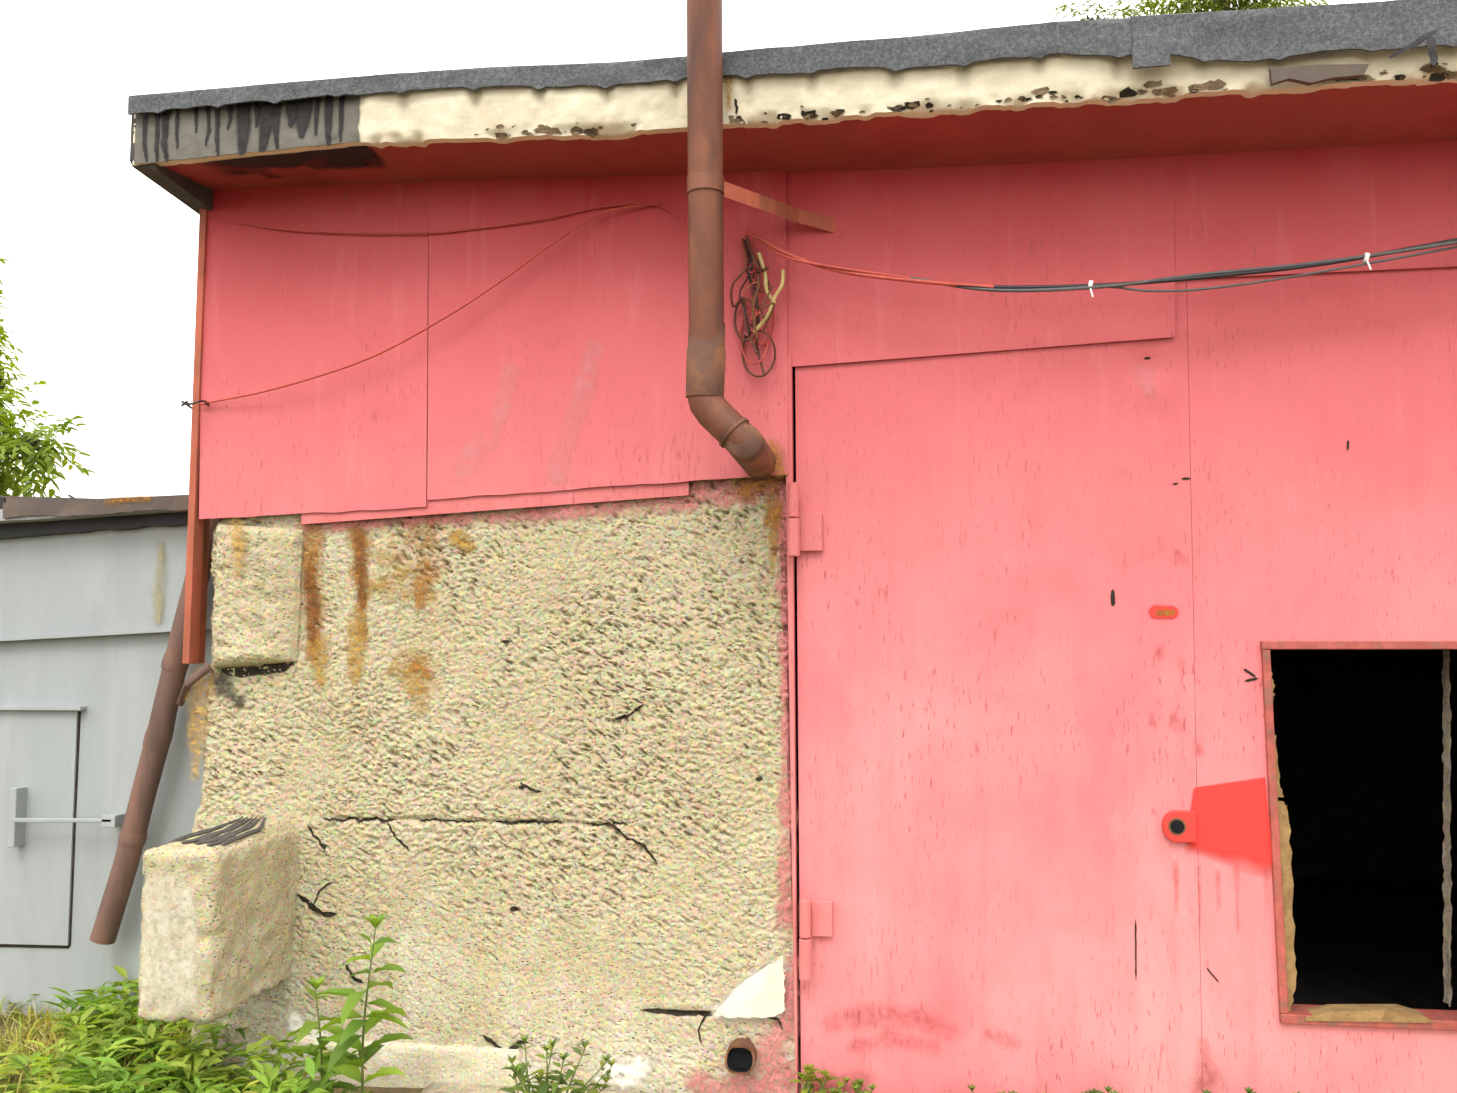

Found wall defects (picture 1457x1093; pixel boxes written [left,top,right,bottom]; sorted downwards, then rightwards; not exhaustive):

spalling [1335,62,1457,82]
spalling [728,105,865,125]
spalling [887,87,1083,113]
spalling [1101,79,1228,104]
leakage [134,95,382,178]
rust [302,523,328,686]
rust [347,515,474,683]
rust [387,656,432,712]
crack [616,704,644,720]
crack [297,782,657,917]
crack [640,1008,716,1044]